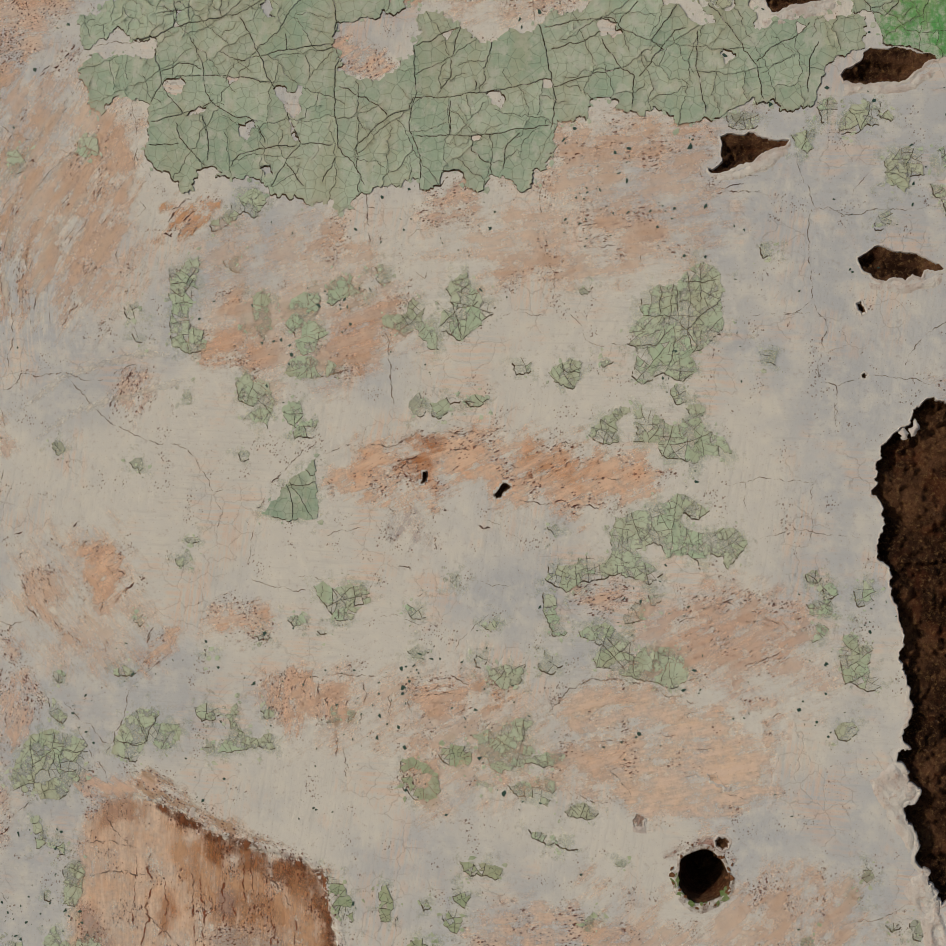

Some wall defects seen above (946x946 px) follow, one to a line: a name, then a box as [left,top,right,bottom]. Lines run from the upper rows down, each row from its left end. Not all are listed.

peeling [66,0,946,364]
peeling [803,568,841,647]
peeling [831,632,888,697]
flaking render [850,396,946,908]
peeling [1,664,92,800]
peeling [831,722,859,746]
flaking render [18,789,365,946]
peeling [372,876,403,922]
spalling [673,834,735,914]
peeling [885,909,924,942]